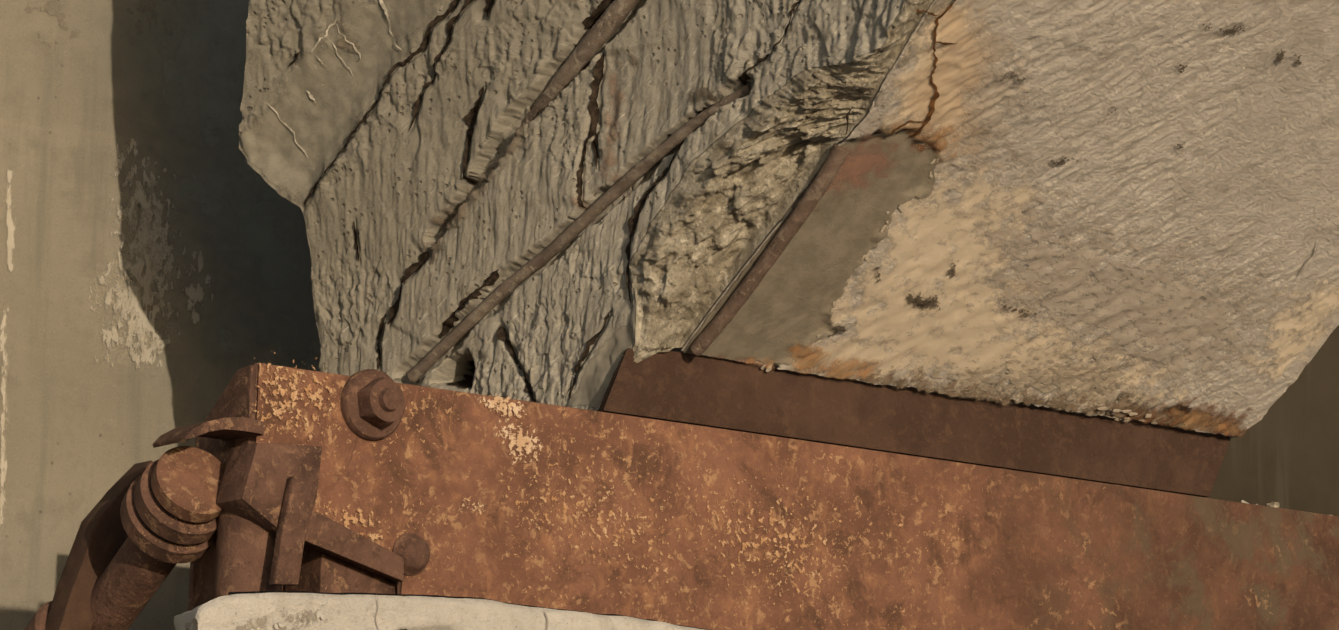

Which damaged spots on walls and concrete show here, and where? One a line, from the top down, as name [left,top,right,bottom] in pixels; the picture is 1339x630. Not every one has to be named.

crack [239,0,959,411]
spalling [406,0,953,409]
rust [894,124,956,156]
rust [791,346,1250,438]